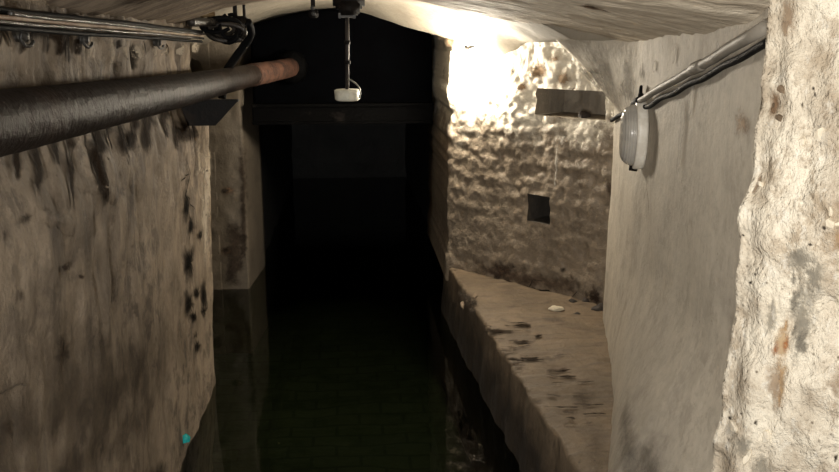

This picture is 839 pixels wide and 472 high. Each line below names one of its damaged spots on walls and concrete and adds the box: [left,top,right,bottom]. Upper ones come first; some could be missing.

corrosion [773,322,788,355]